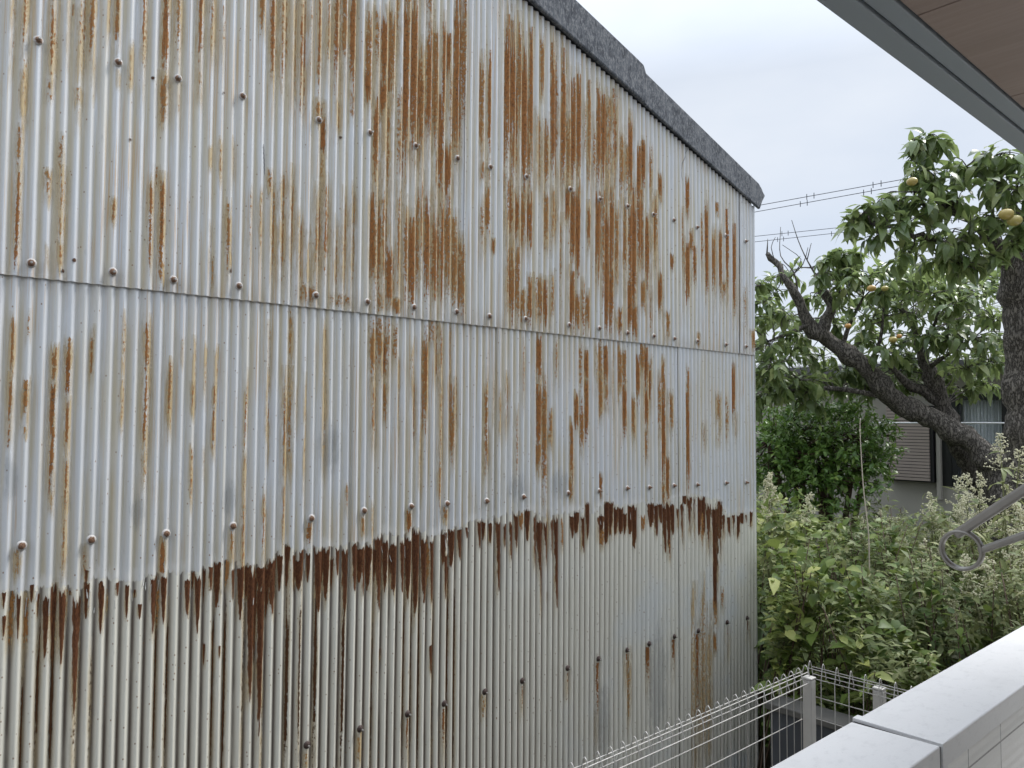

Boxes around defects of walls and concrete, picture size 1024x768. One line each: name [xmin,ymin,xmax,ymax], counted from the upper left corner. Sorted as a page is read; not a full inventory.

rust [72,0,121,113]
rust [158,0,183,130]
rust [148,167,166,287]
rust [249,0,746,546]
rust [7,314,30,447]
rust [47,337,72,576]
rust [158,536,166,573]
rust [19,627,55,768]
rust [152,626,169,767]
rust [210,599,227,768]
rust [284,580,317,767]
rust [401,590,455,765]